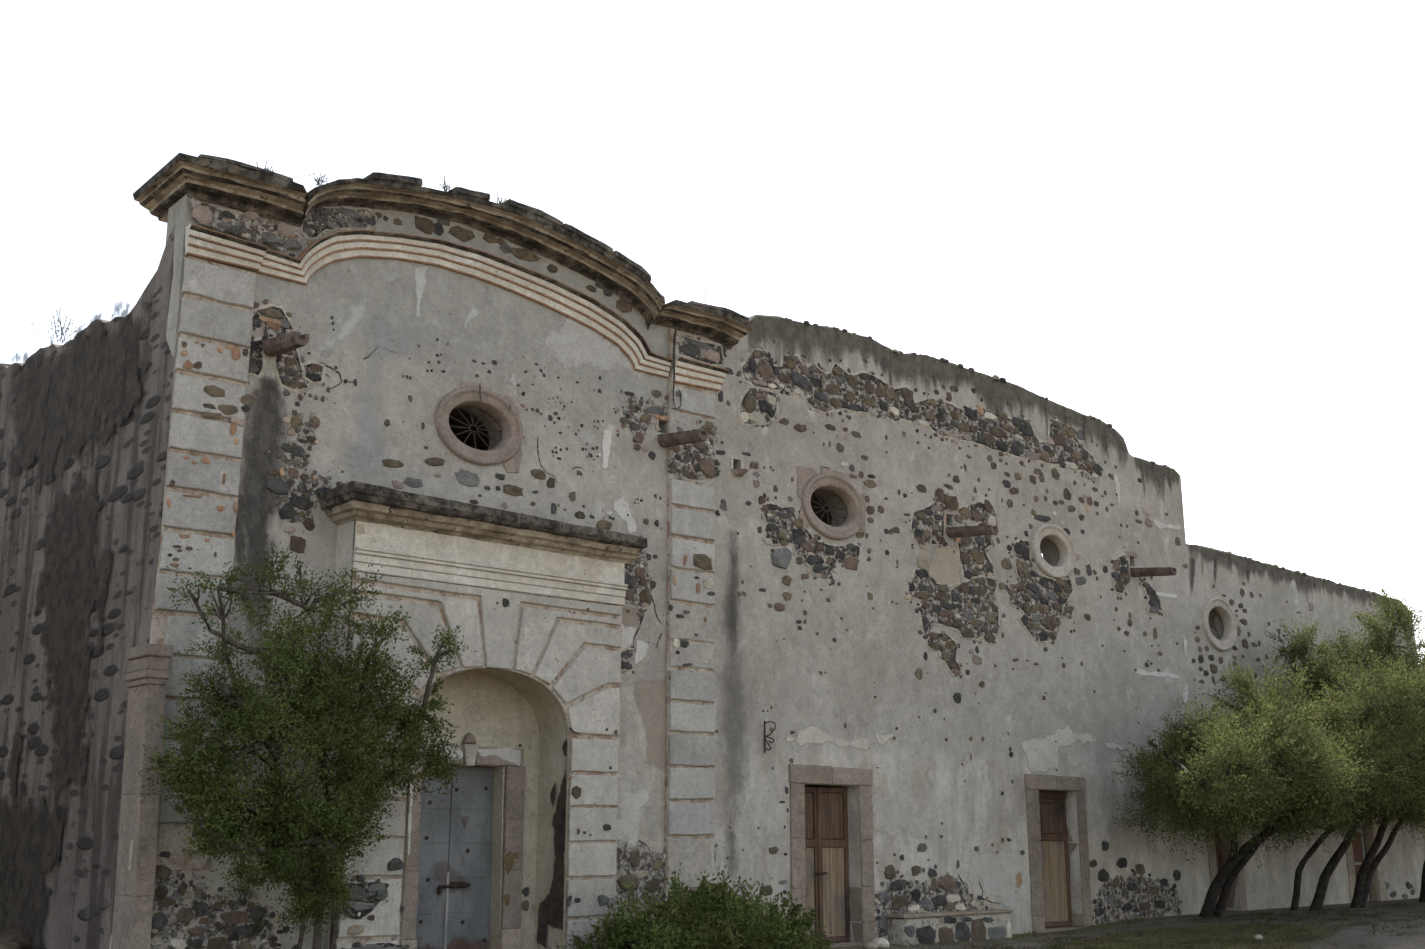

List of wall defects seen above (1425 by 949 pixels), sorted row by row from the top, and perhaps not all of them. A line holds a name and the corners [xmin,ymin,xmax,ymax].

leakage [235,377,285,636]
flaking render [181,299,357,553]
flaking render [402,338,449,402]
flaking render [381,446,662,674]
flaking render [517,363,725,480]
flaking render [669,605,707,672]
leakage [749,316,1179,492]
flaking render [673,334,1278,704]
flaking render [504,739,687,948]
flaking render [862,822,997,940]